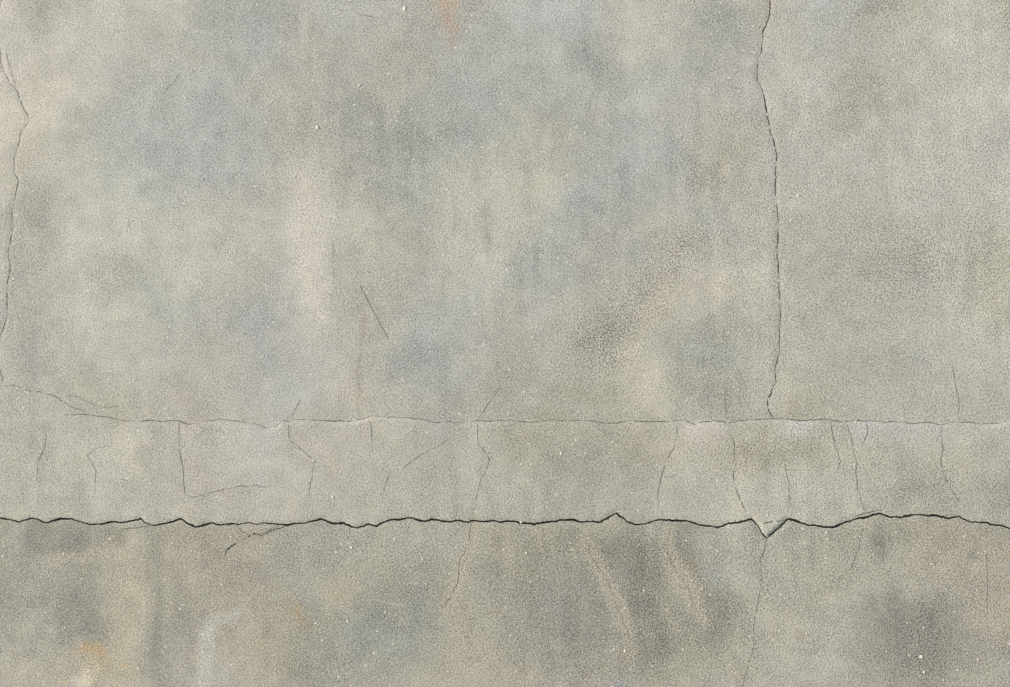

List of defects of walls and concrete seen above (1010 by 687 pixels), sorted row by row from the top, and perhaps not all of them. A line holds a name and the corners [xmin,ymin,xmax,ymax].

crack [0,64,1010,607]